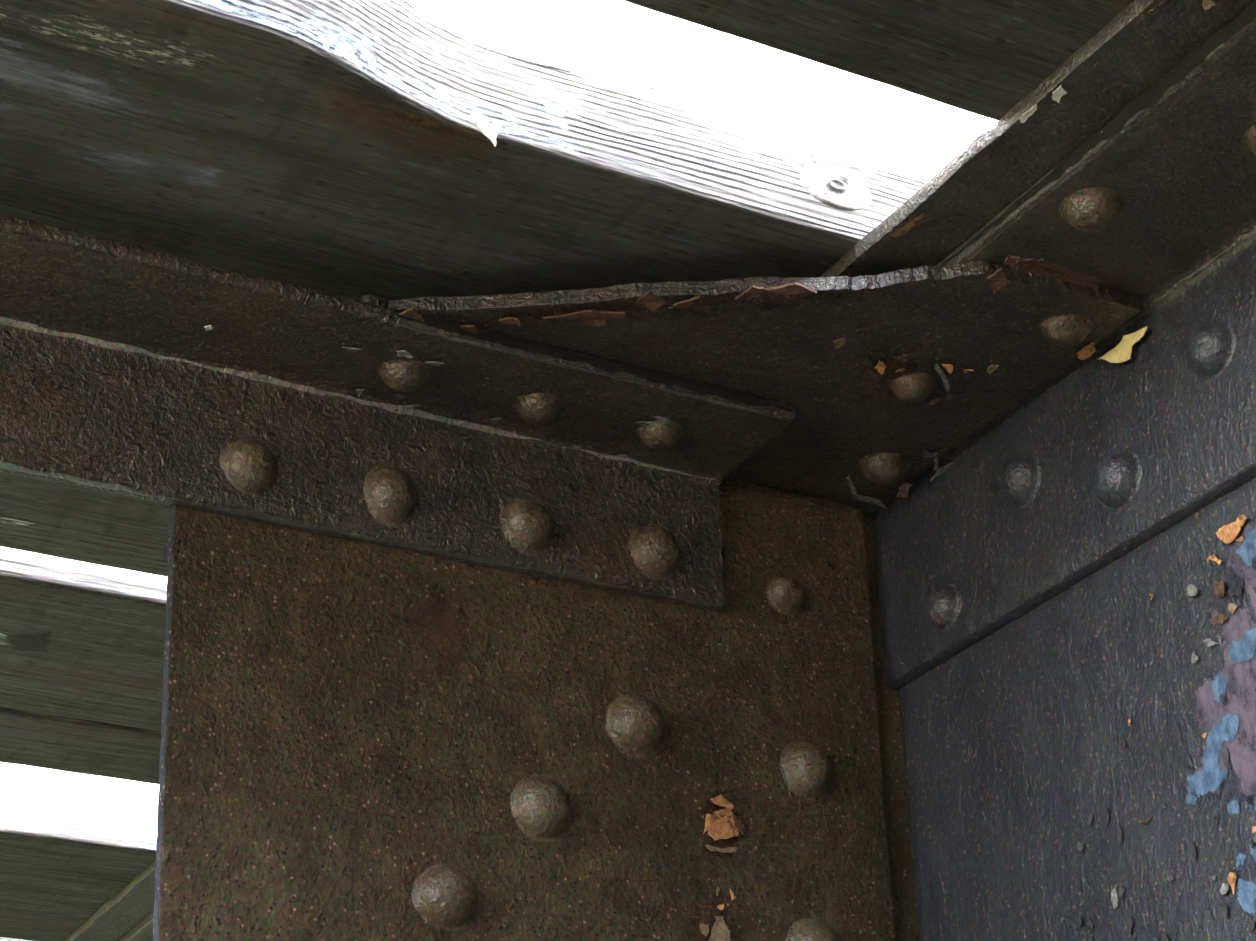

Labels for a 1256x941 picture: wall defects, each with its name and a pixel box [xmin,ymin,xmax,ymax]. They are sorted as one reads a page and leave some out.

rust [987,255,1099,295]
rust [461,282,854,334]
rust [942,364,999,374]
rust [1077,342,1096,361]
peeling [1185,515,1256,814]
peeling [1220,826,1256,916]